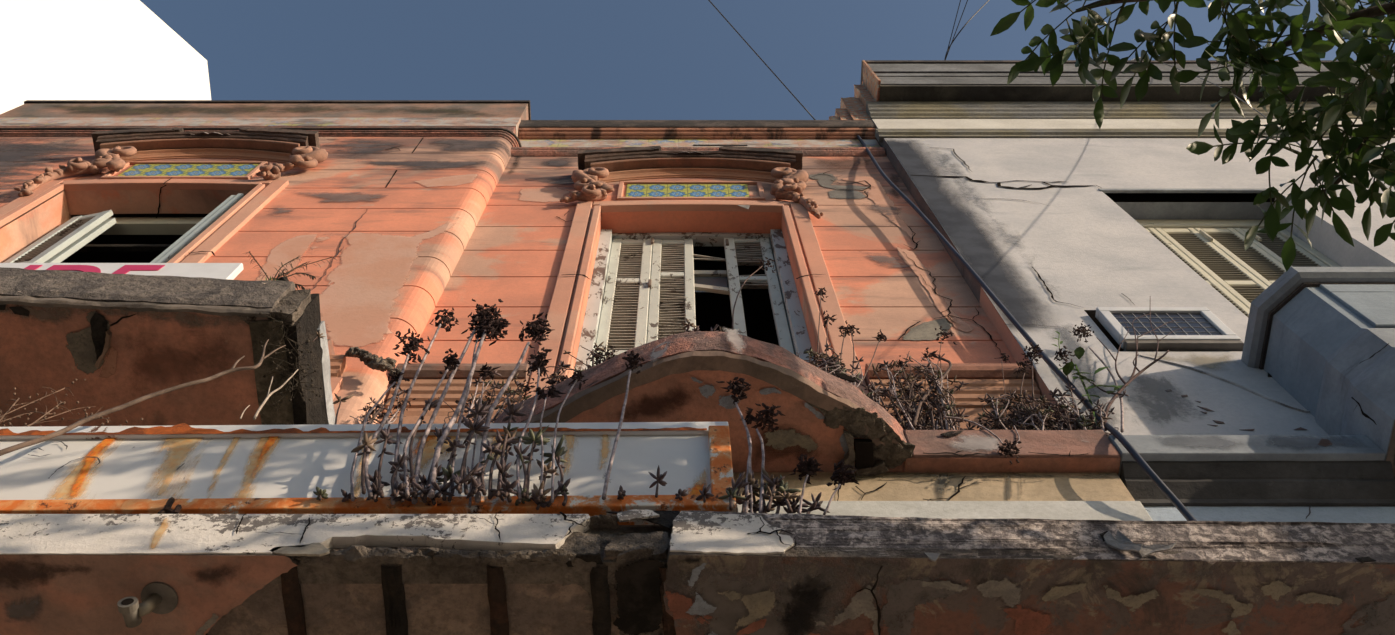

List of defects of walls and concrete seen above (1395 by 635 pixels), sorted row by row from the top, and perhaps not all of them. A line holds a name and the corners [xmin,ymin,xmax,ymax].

damp [0,139,91,203]
crack [912,147,1099,205]
crack [312,209,367,290]
spalling [249,222,454,425]
crack [904,226,1080,362]
rust [52,438,115,499]
rust [158,438,201,494]
rust [237,436,279,498]
rust [415,435,456,465]
spalling [195,509,775,635]
peeling [808,585,882,635]
peeling [1193,579,1343,635]